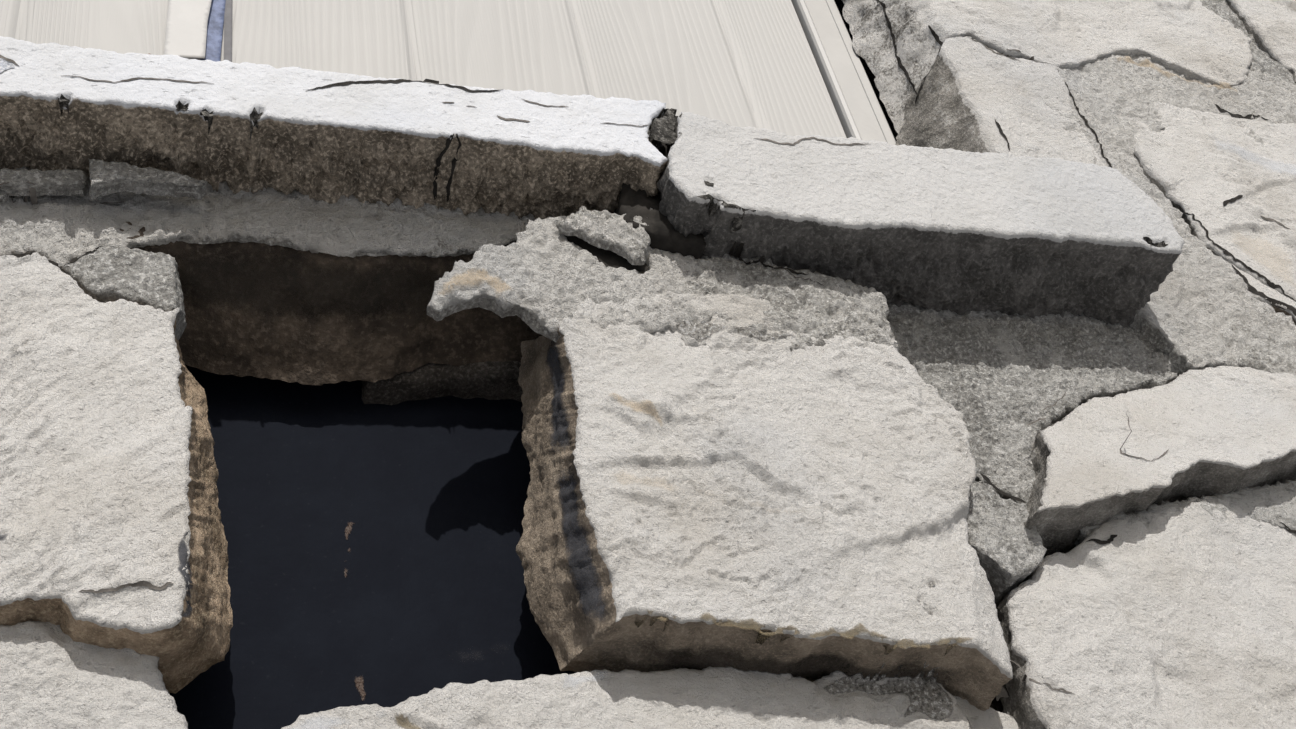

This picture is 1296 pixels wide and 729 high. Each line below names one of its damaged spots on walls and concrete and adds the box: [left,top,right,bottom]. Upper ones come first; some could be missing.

crack [63,75,211,84]
crack [876,0,1112,168]
crack [1215,104,1268,120]
crack [307,79,568,203]
crack [754,137,865,146]
crack [1182,195,1296,315]
water stain [546,346,570,446]
crack [1028,392,1066,425]
crack [1120,414,1168,461]
crack [980,473,1027,503]
water stain [558,474,606,619]
crack [1088,535,1117,545]